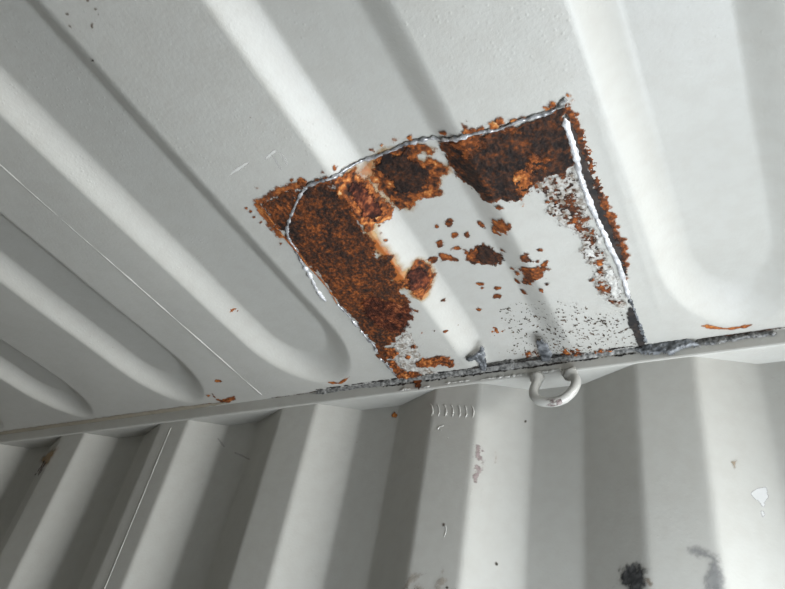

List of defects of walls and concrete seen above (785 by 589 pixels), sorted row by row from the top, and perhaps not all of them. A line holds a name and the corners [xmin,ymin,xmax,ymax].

corrosion [245,94,634,365]
peeling [537,167,627,308]
corrosion [700,324,782,340]